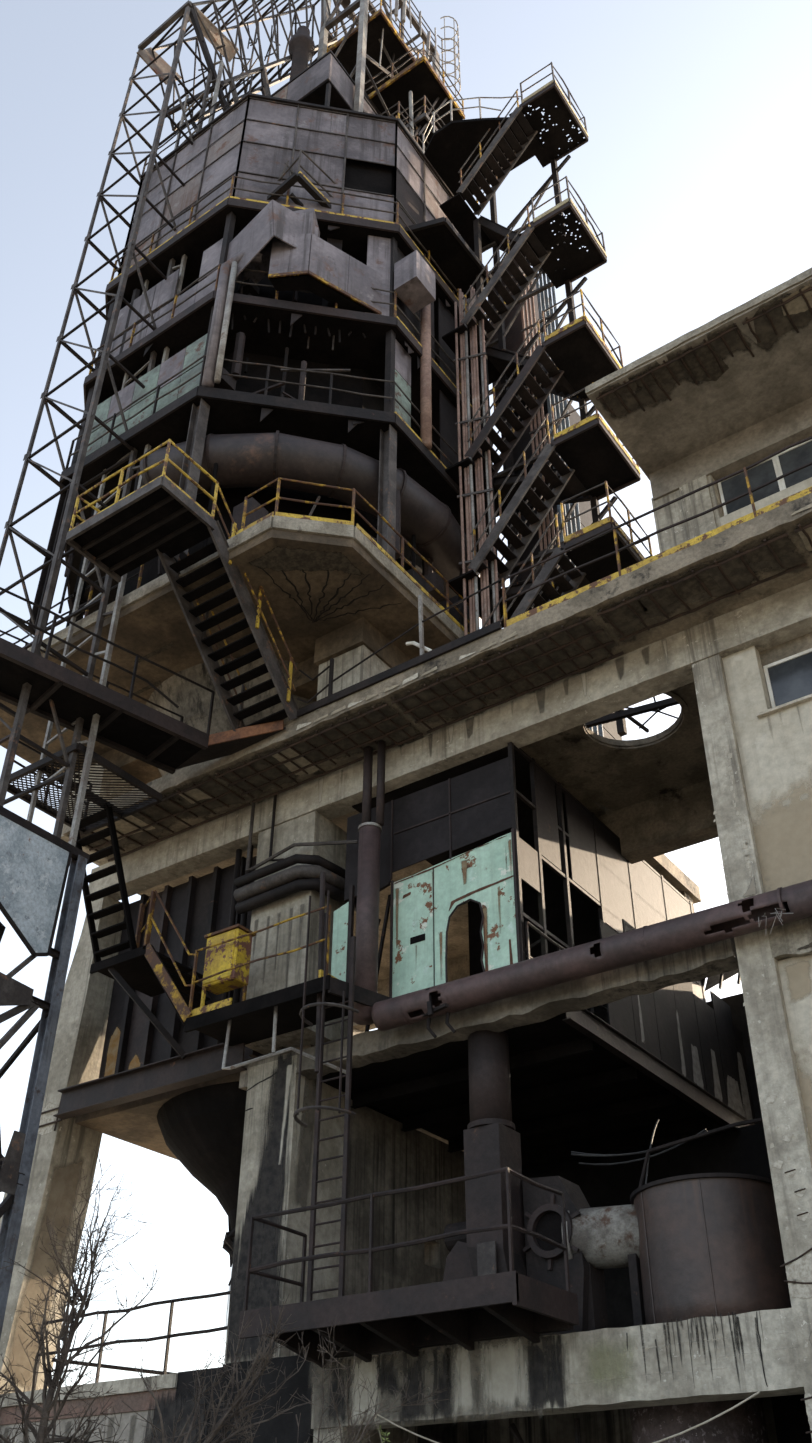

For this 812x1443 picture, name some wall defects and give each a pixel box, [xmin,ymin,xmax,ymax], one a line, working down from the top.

spalling [596,284,812,419]
crack [258,567,401,623]
peeling [395,836,505,898]
peeling [449,858,513,972]
corrosion [483,886,501,958]
damp [329,1335,566,1423]
damp [626,1311,764,1380]